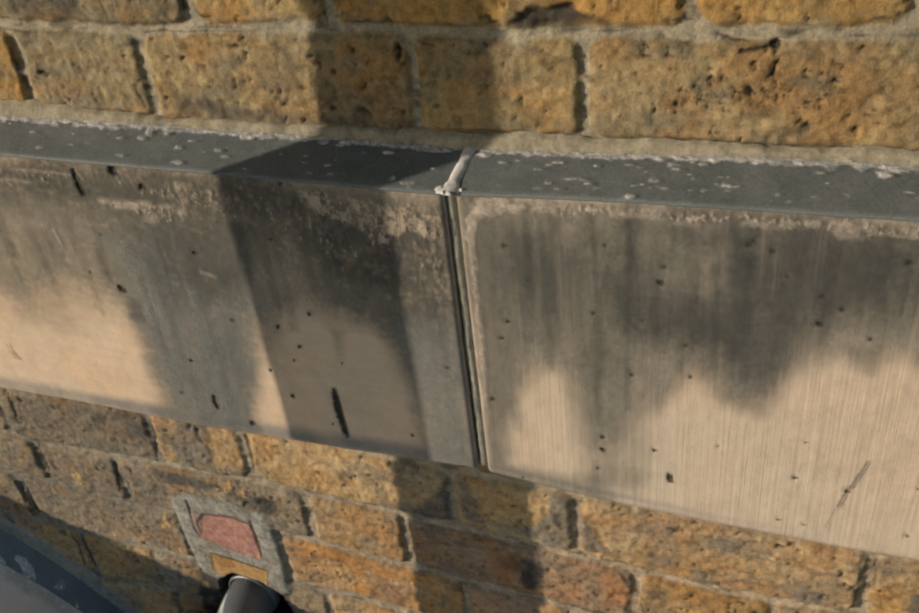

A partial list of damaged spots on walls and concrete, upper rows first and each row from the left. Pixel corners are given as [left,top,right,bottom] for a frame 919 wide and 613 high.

damp [0,115,452,154]
damp [0,163,471,459]
damp [461,197,919,467]